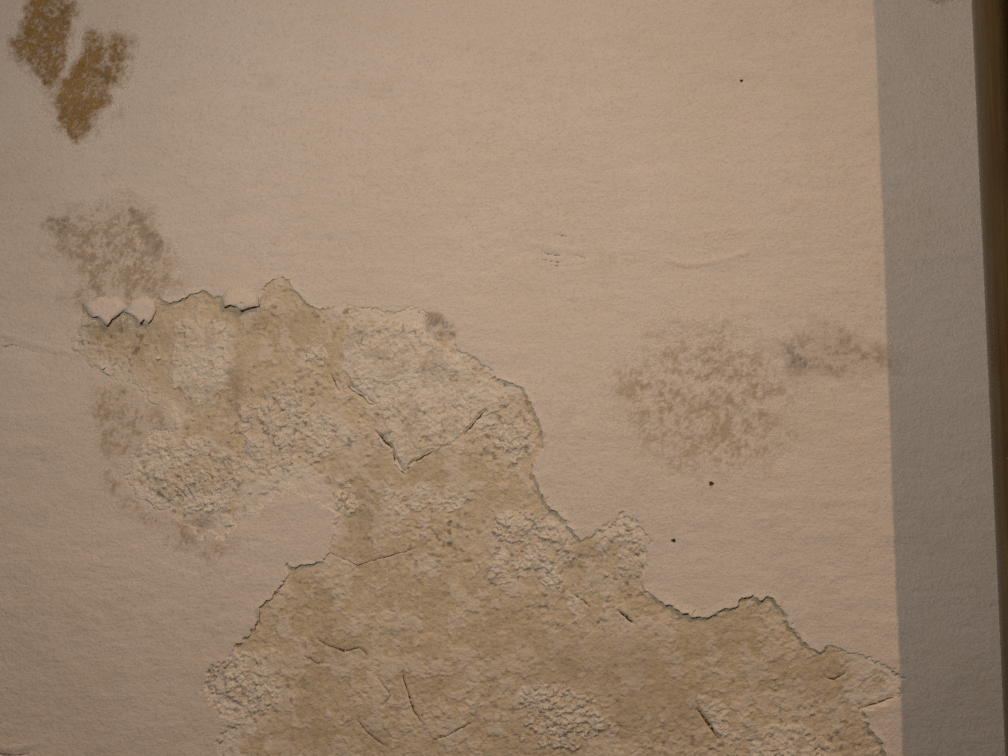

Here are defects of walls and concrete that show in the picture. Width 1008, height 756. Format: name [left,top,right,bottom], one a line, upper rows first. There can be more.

spalling [71,272,905,756]